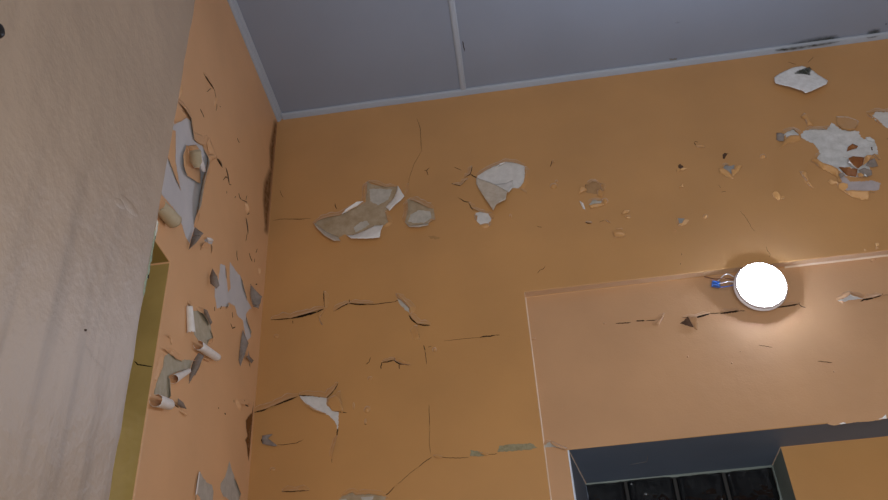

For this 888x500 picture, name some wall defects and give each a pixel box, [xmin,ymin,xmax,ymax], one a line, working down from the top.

peeling [774,66,828,93]
peeling [776,108,888,200]
peeling [143,84,231,296]
peeling [313,180,440,241]
peeling [459,159,530,228]
peeling [149,251,262,416]
crack [271,291,431,369]
crack [603,308,742,330]
crack [777,300,806,308]
crack [254,382,346,459]
peeling [195,461,241,500]